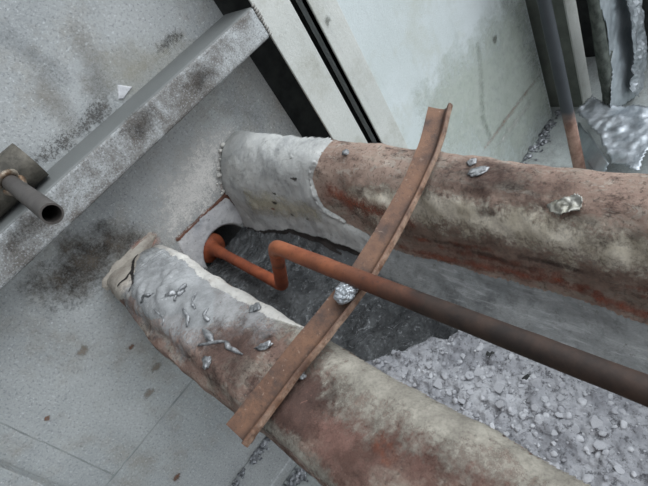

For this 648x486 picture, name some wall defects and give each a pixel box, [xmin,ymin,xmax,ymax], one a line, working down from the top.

crack [117,255,137,292]